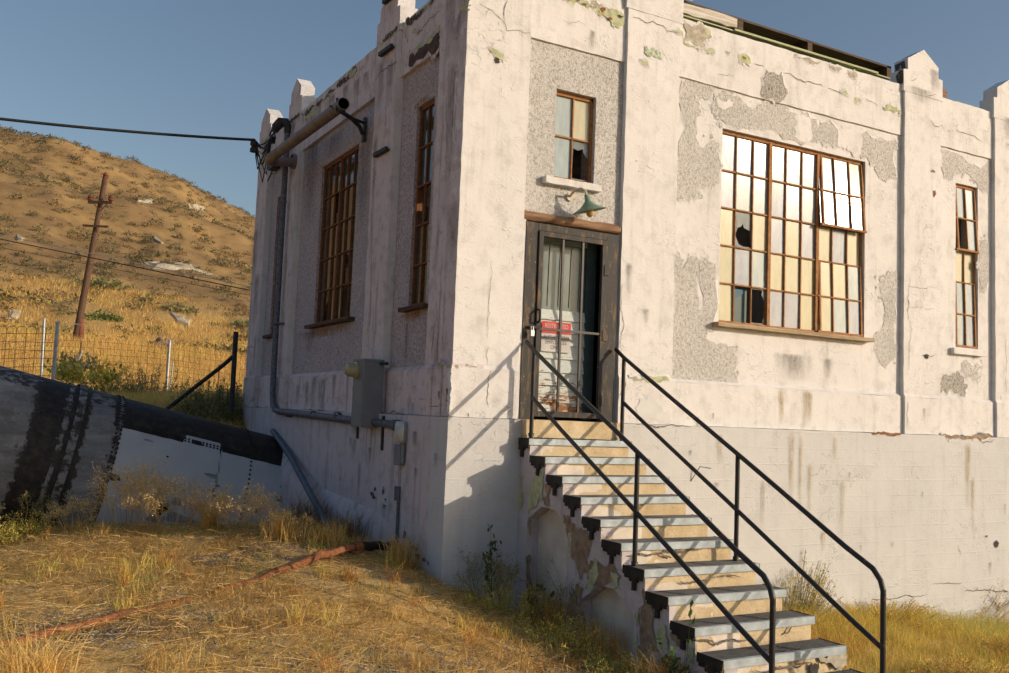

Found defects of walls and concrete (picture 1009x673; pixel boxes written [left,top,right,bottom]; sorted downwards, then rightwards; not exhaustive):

spalling [378,0,441,69]
peeling [563,0,626,29]
peeling [671,19,753,66]
peeling [793,54,862,105]
spalling [677,70,902,204]
spalling [932,147,991,194]
spalling [629,251,740,424]
spalling [873,268,900,369]
spalling [940,356,983,398]
peeling [563,515,621,632]
peeling [633,589,694,664]